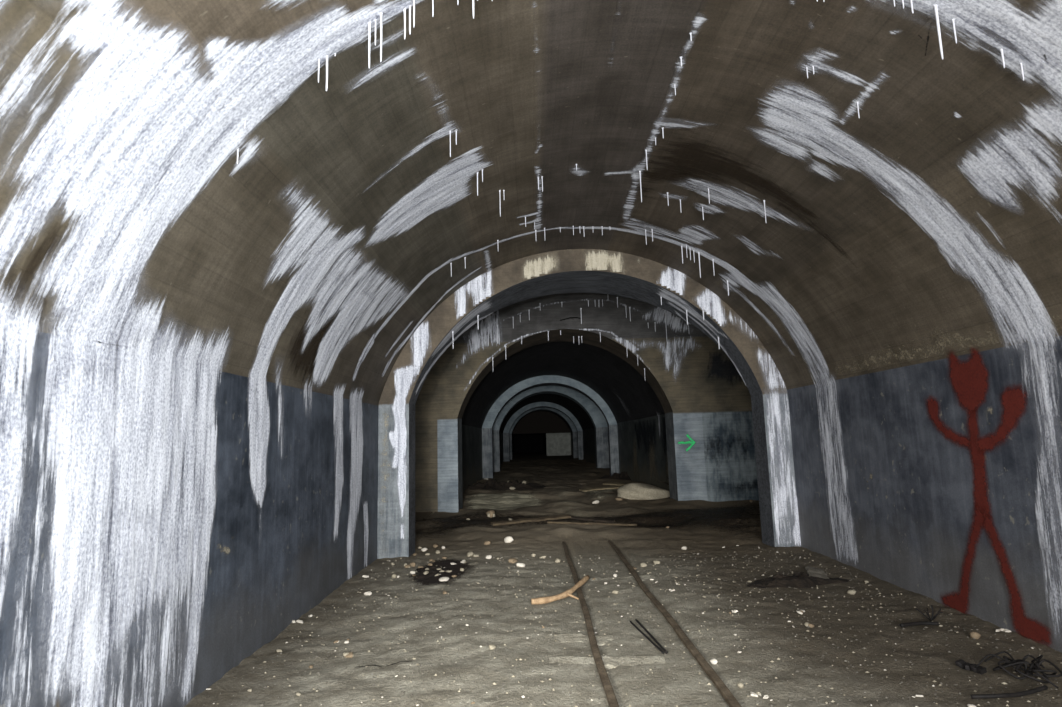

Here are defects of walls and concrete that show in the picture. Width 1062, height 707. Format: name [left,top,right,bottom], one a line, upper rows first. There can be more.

leakage [0,0,434,707]
leakage [248,17,858,579]
leakage [754,51,1062,631]
leakage [883,0,1062,206]